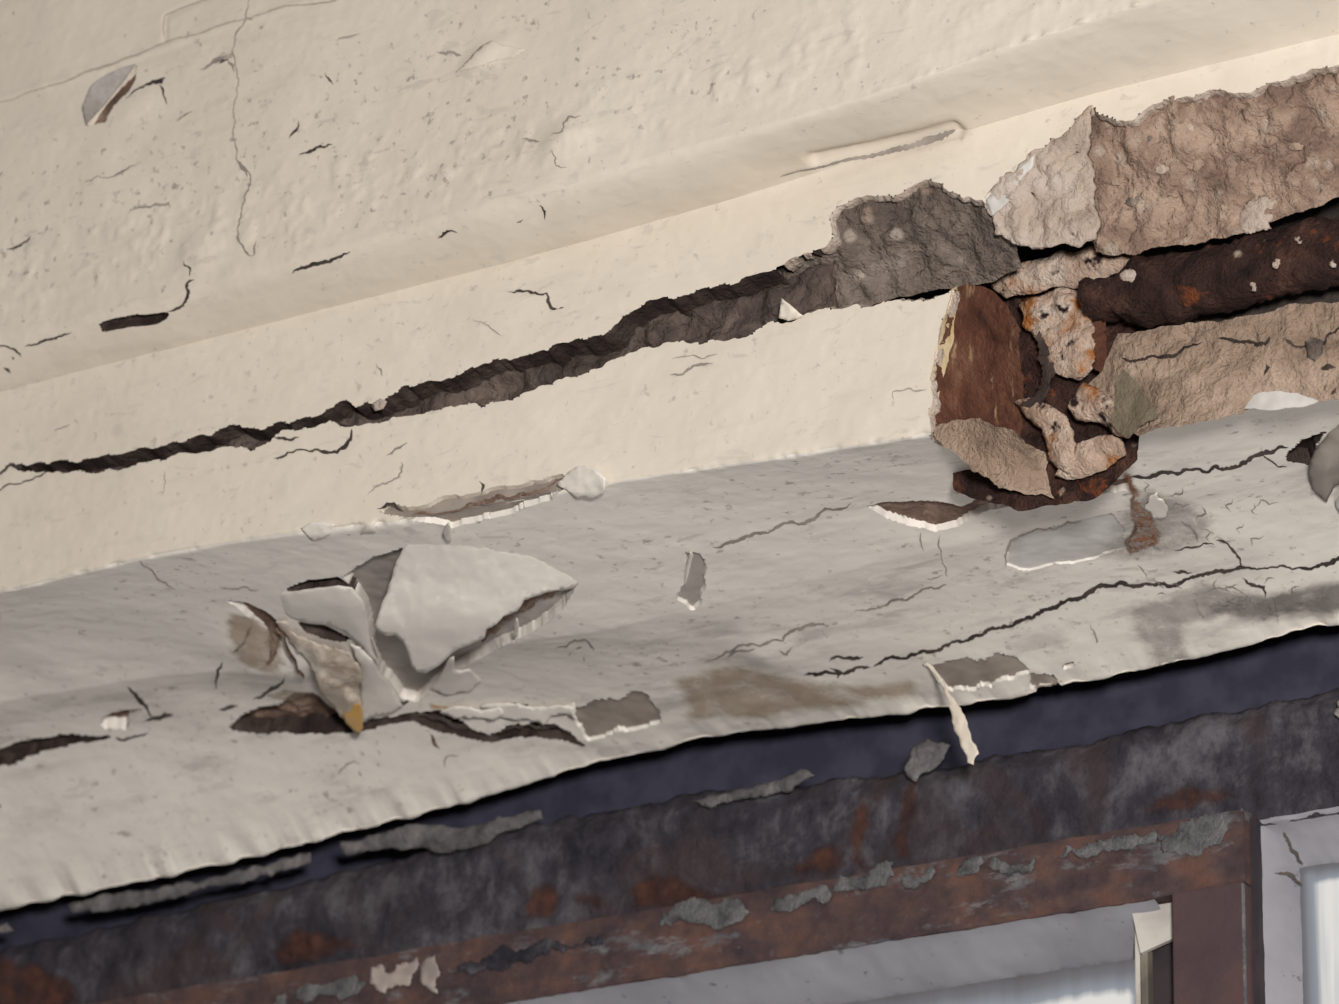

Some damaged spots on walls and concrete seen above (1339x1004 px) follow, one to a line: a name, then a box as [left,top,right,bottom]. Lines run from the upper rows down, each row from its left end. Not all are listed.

crack [0,0,336,256]
crack [293,252,350,273]
spalling [776,65,1339,446]
crack [212,260,840,494]
rust [928,283,1054,499]
peeling [215,465,660,749]
spalling [875,499,990,525]
crack [705,445,1339,679]
peeling [1004,514,1126,569]
rust [1125,475,1168,554]
crack [0,733,64,755]
rust [635,876,714,906]